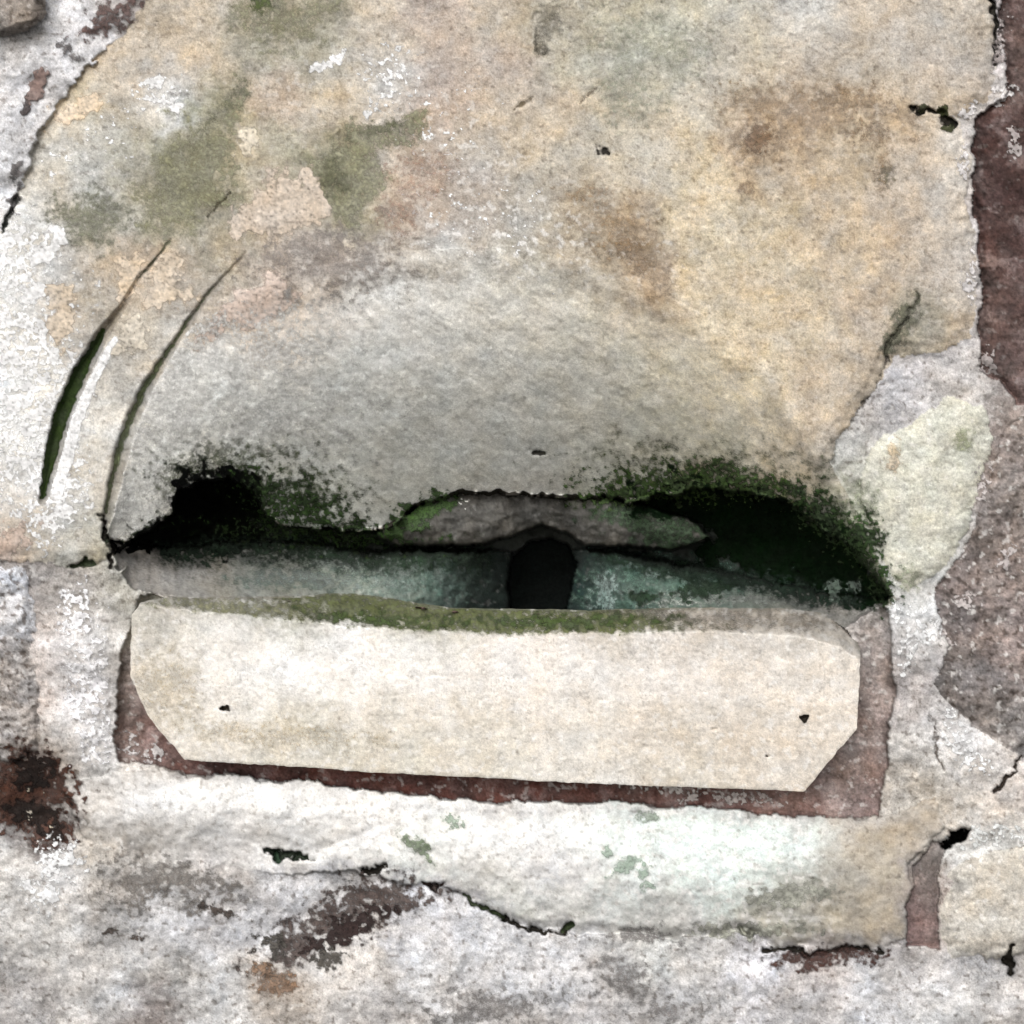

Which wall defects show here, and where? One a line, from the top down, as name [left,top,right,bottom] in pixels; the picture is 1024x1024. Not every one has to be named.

water stain [105,438,493,585]
crack [67,514,133,569]
water stain [317,547,864,632]
crack [361,863,388,876]
crack [421,881,575,936]